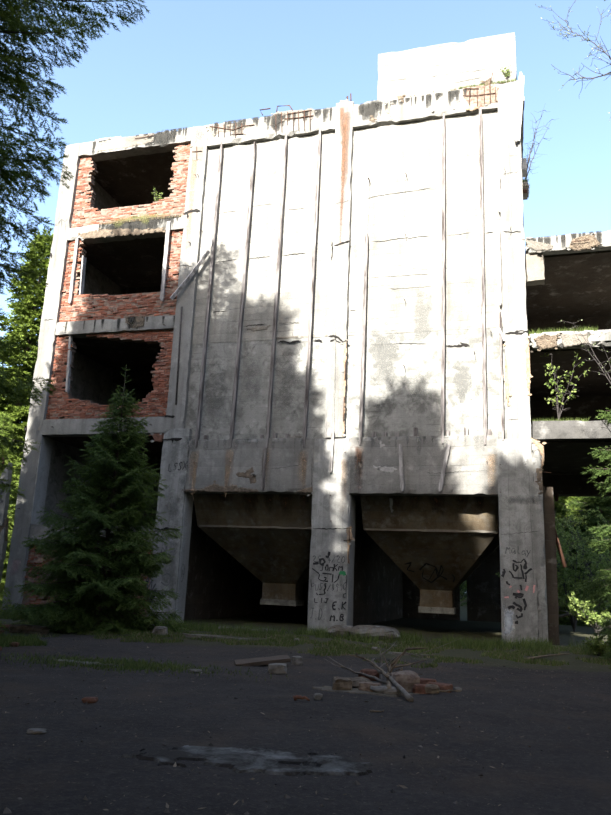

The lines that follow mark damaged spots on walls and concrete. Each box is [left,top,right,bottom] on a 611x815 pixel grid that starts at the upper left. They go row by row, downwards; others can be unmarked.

leakage [359,89,471,119]
corrosion [340,108,349,220]
spalling [522,238,555,253]
spalling [566,233,602,251]
spalling [524,331,592,396]